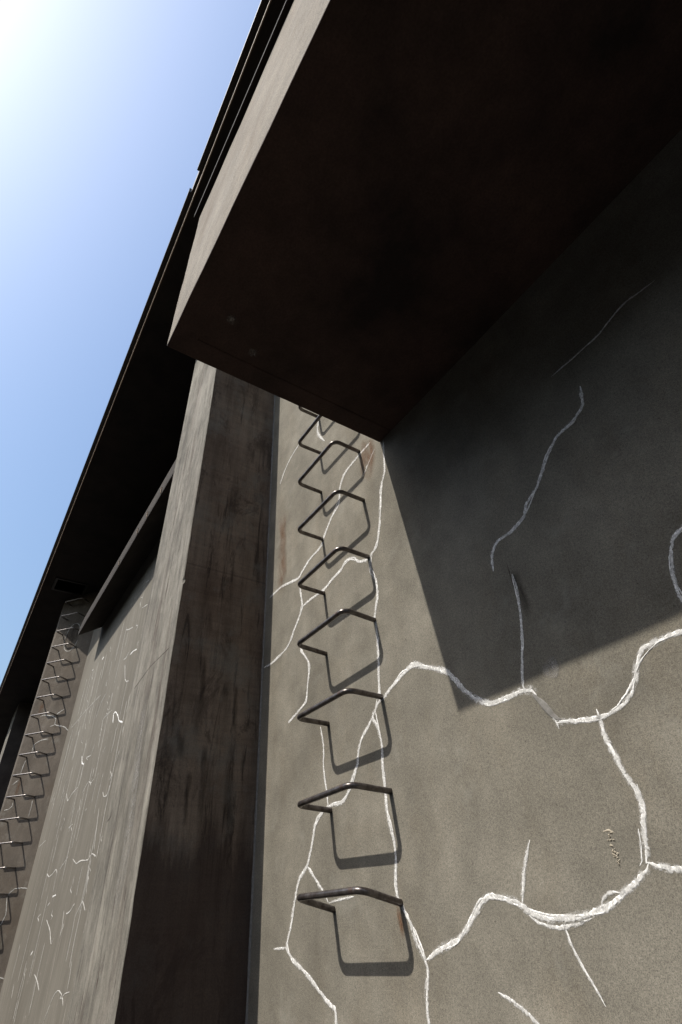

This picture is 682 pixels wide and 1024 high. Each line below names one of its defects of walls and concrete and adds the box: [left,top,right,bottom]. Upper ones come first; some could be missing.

crack [551,280,655,377]
crack [0,580,170,1023]
crack [264,386,682,1024]